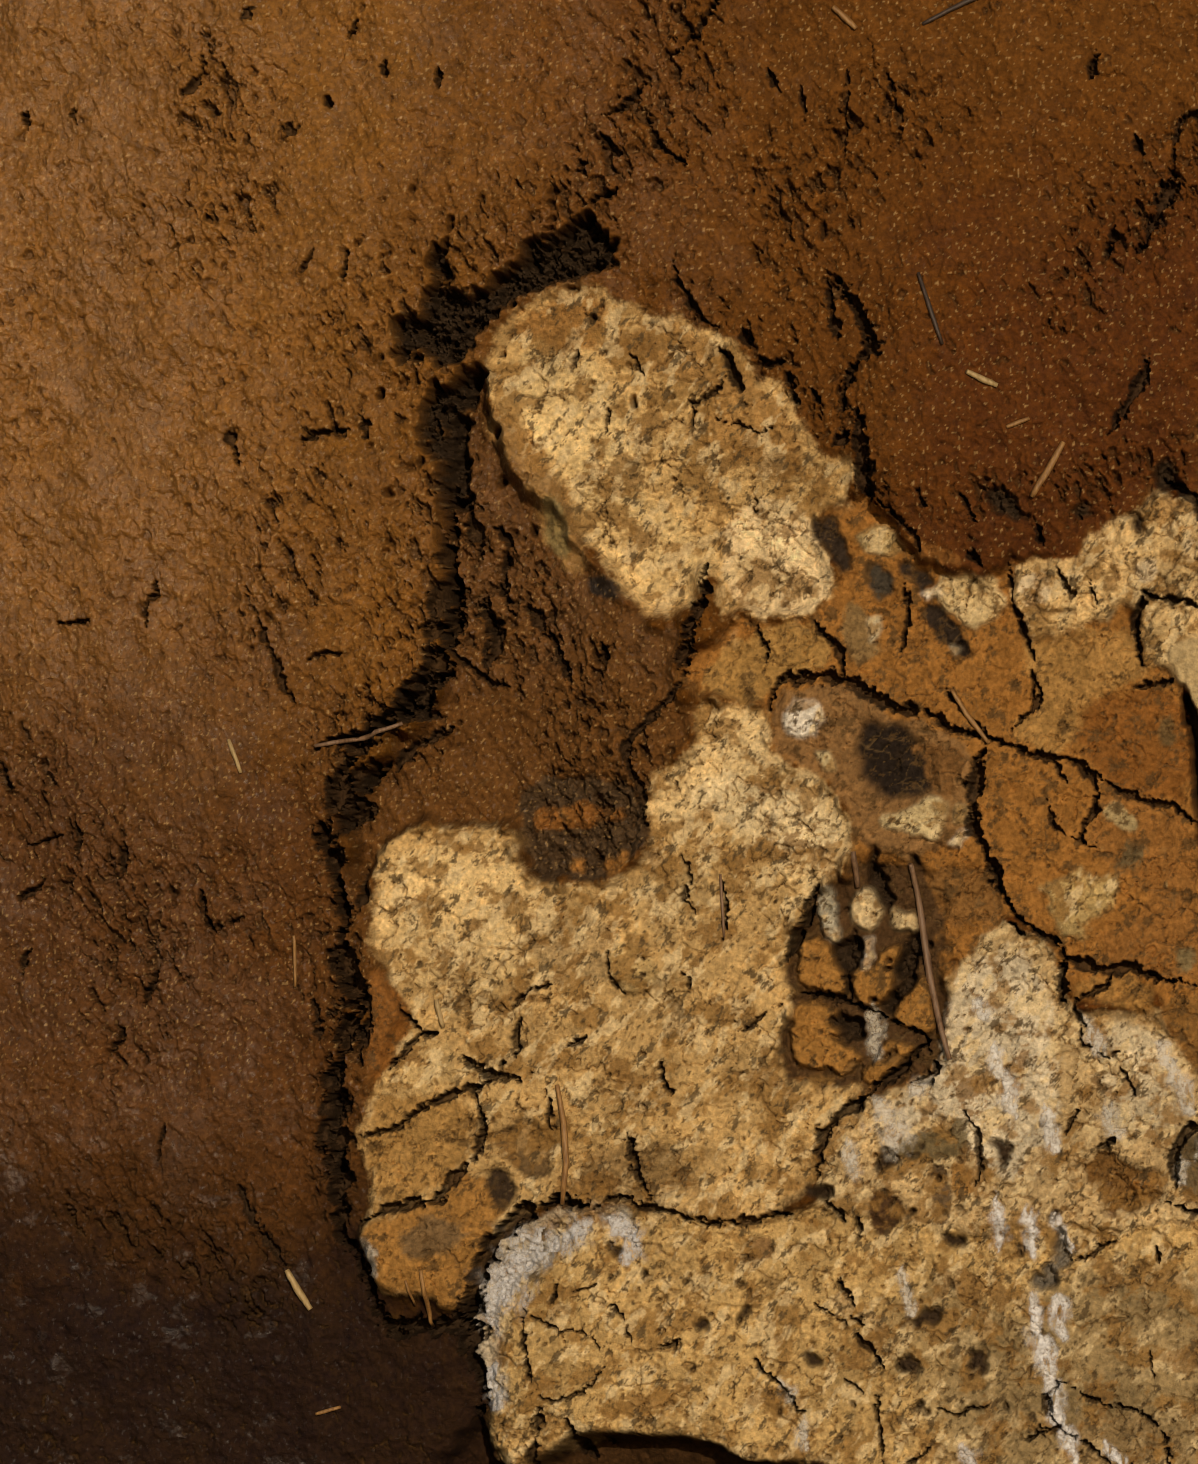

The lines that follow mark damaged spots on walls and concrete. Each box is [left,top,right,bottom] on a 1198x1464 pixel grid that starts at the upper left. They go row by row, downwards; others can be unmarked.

crack [671,268,1198,1096]
spalling [346,212,1198,1464]
crack [311,507,943,1464]
water stain [484,1213,641,1328]
crack [962,1110,985,1182]
water stain [992,1191,1074,1258]
crack [1065,1109,1116,1150]
crack [1166,1120,1198,1219]
water stain [486,1362,503,1411]
water stain [1029,1293,1079,1464]
crack [1024,1353,1175,1464]
water stain [1104,1440,1127,1464]